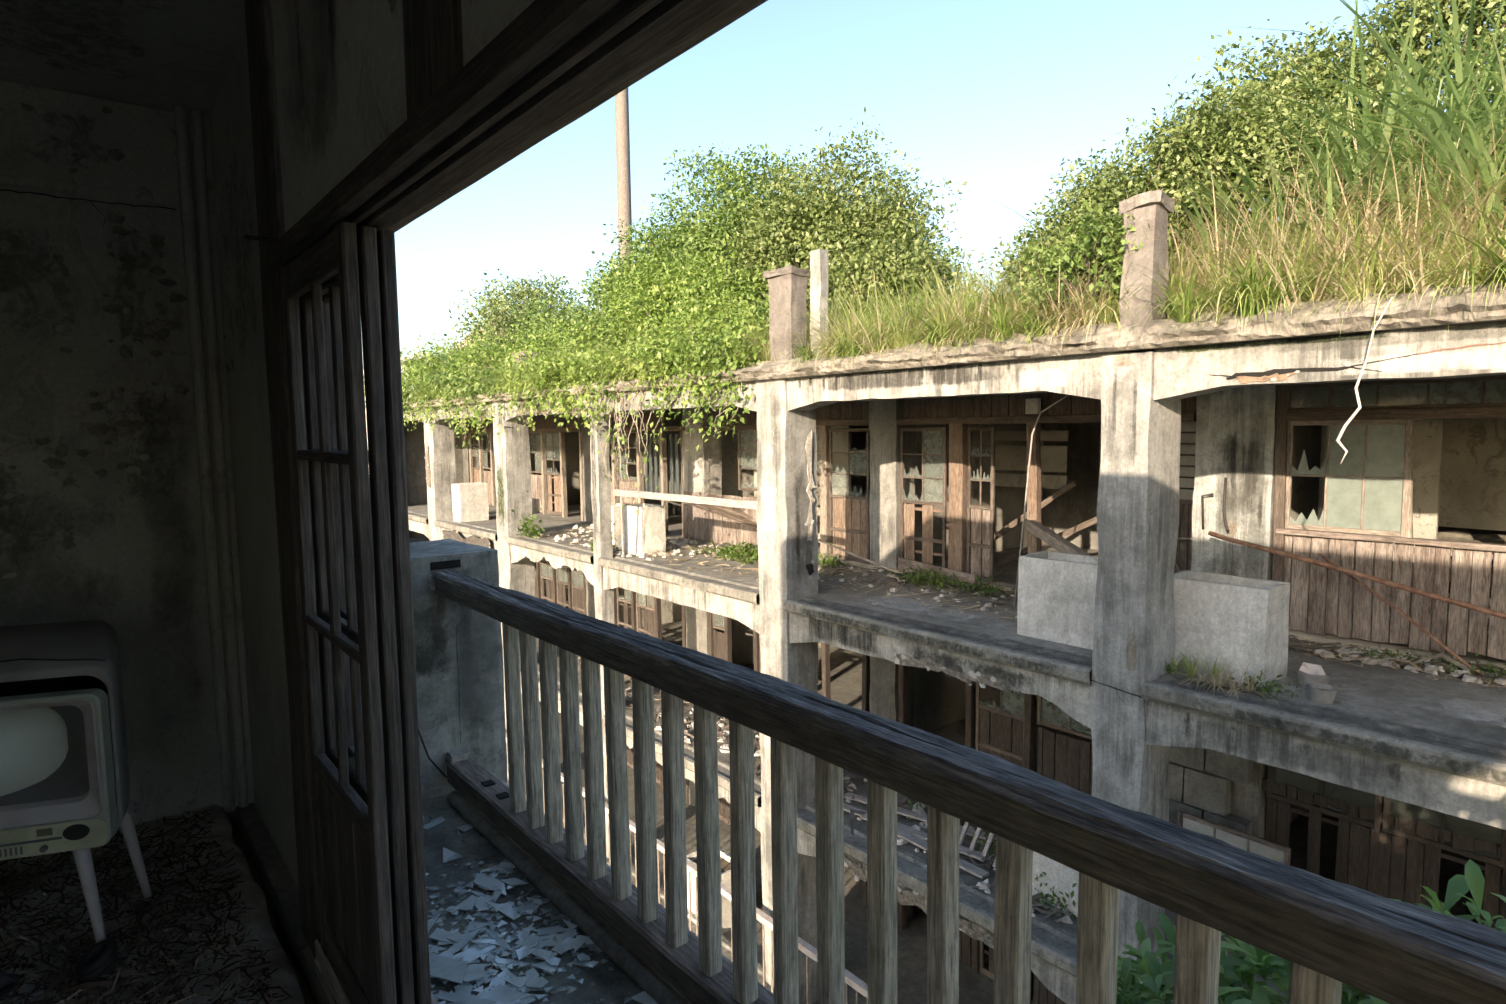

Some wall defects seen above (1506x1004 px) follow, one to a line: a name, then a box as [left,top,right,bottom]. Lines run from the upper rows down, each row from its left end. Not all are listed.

crack [0,189,176,225]
crack [1213,342,1506,380]